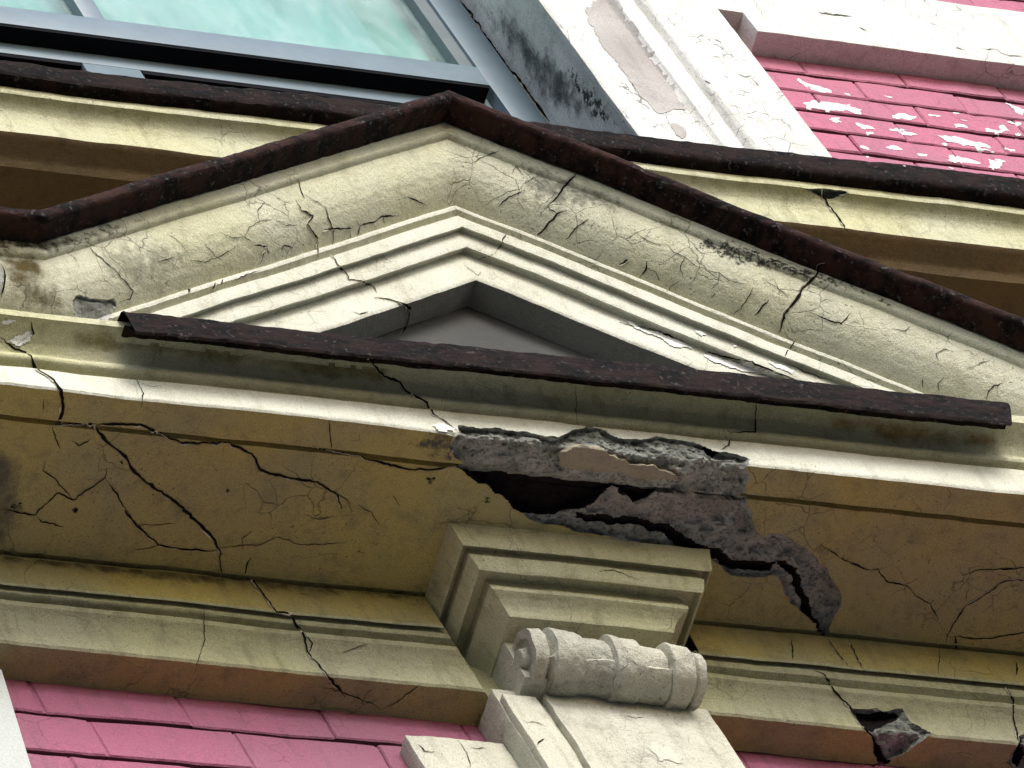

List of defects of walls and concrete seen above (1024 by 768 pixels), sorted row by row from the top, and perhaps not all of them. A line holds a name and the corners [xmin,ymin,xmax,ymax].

leakage [502,20,609,121]
peeling [584,0,687,138]
peeling [797,78,874,158]
peeling [938,103,1024,170]
flaking render [72,295,116,320]
crack [158,179,427,332]
crack [470,150,594,240]
crack [620,233,855,379]
crack [822,188,848,232]
crack [0,322,421,710]
flaking render [433,423,842,636]
flaking render [851,707,933,765]